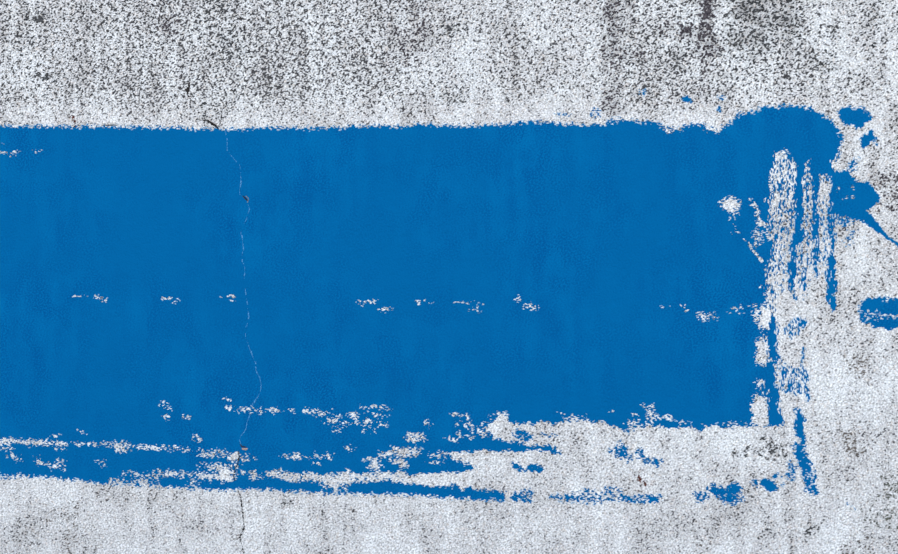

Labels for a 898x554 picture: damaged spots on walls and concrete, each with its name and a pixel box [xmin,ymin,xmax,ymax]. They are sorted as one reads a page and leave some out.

crack [184,76,262,553]
peeling [680,304,719,322]
peeling [717,148,855,367]
peeling [0,378,787,505]